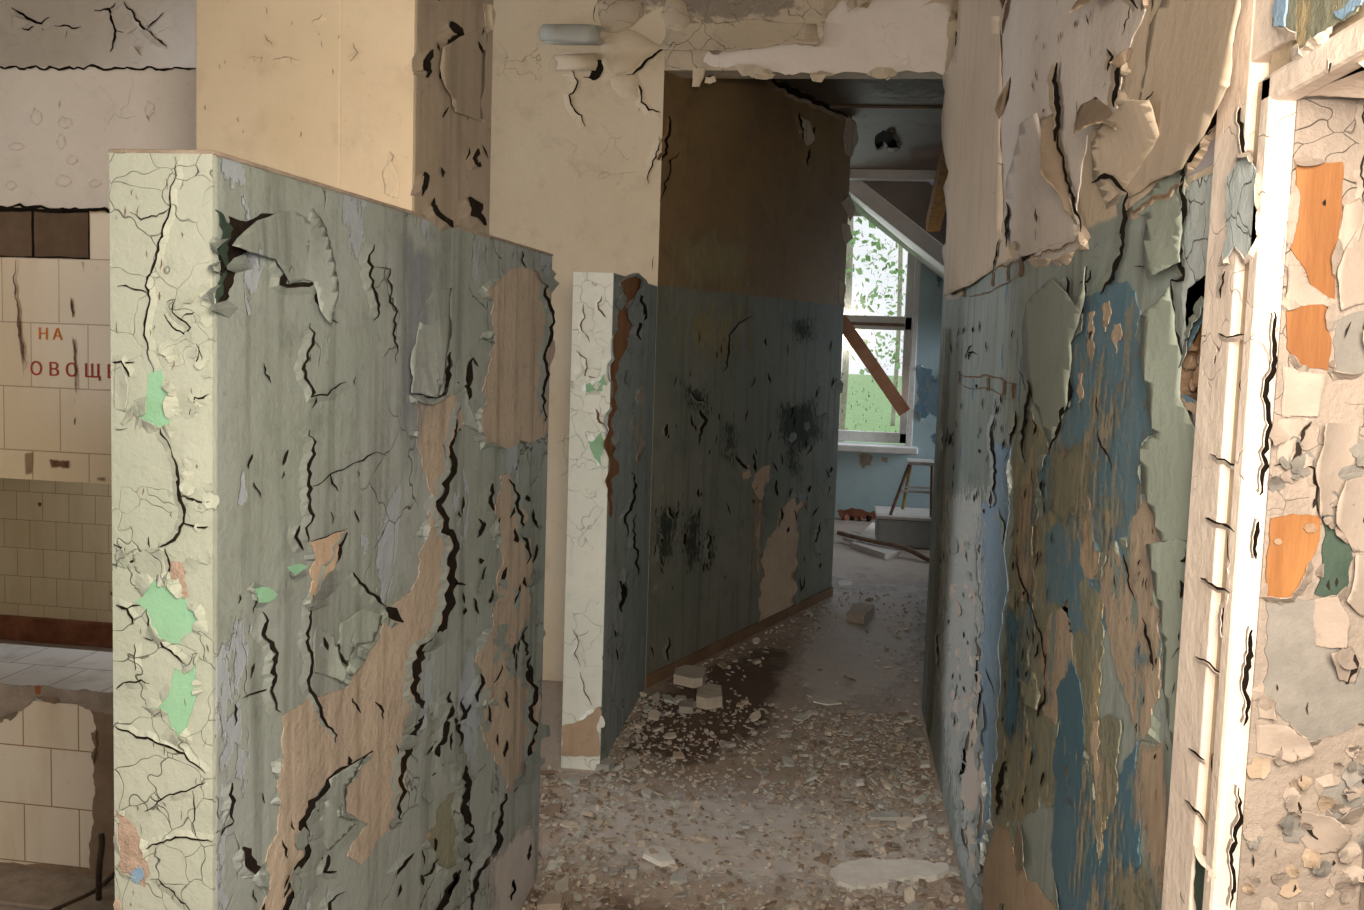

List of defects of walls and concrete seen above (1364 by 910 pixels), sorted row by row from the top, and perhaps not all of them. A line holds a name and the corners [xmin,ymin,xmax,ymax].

crack [9,2,167,52]
crack [386,0,488,231]
crack [627,43,680,201]
peeling [1272,0,1364,60]
peeling [1306,61,1364,98]
crack [521,251,654,427]
peeling [253,265,651,910]
leakage [655,507,719,573]
crack [570,316,834,706]
leakage [776,398,823,480]
peeling [1241,156,1364,910]
spalling [0,683,150,887]